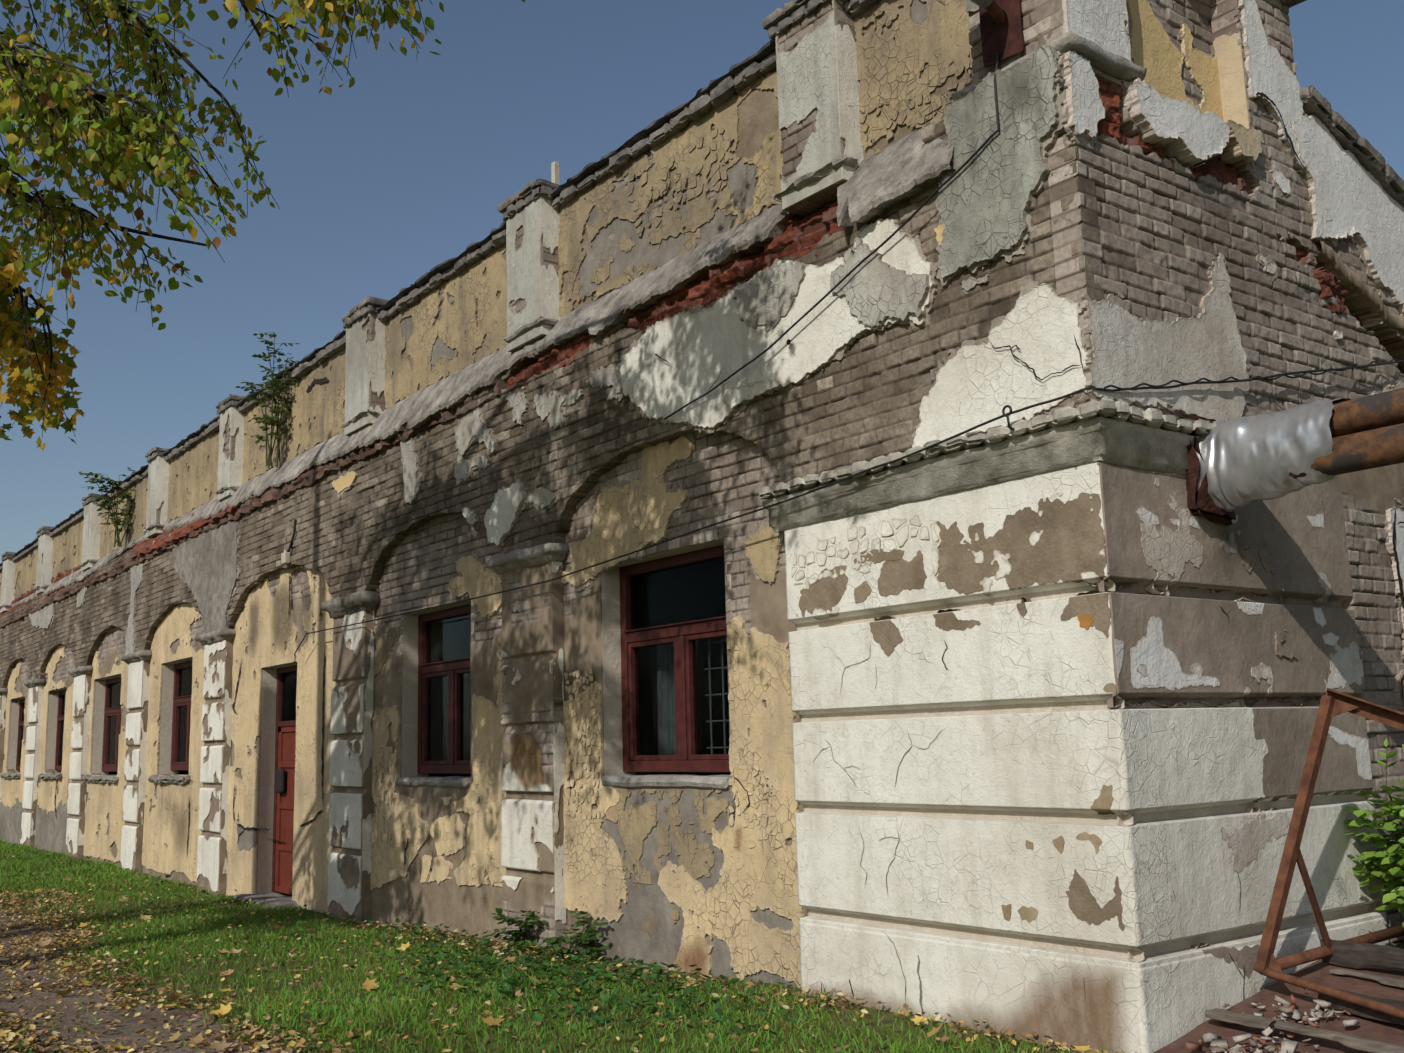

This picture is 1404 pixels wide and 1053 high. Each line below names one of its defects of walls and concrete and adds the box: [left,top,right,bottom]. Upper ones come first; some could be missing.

peeling [503,0,1404,591]
peeling [454,409,498,484]
peeling [745,461,1373,873]
crack [895,729,944,784]
spalling [563,668,772,969]
spalling [372,797,504,933]
spalling [751,907,794,931]
peeling [1066,869,1125,931]
spalling [710,934,799,988]